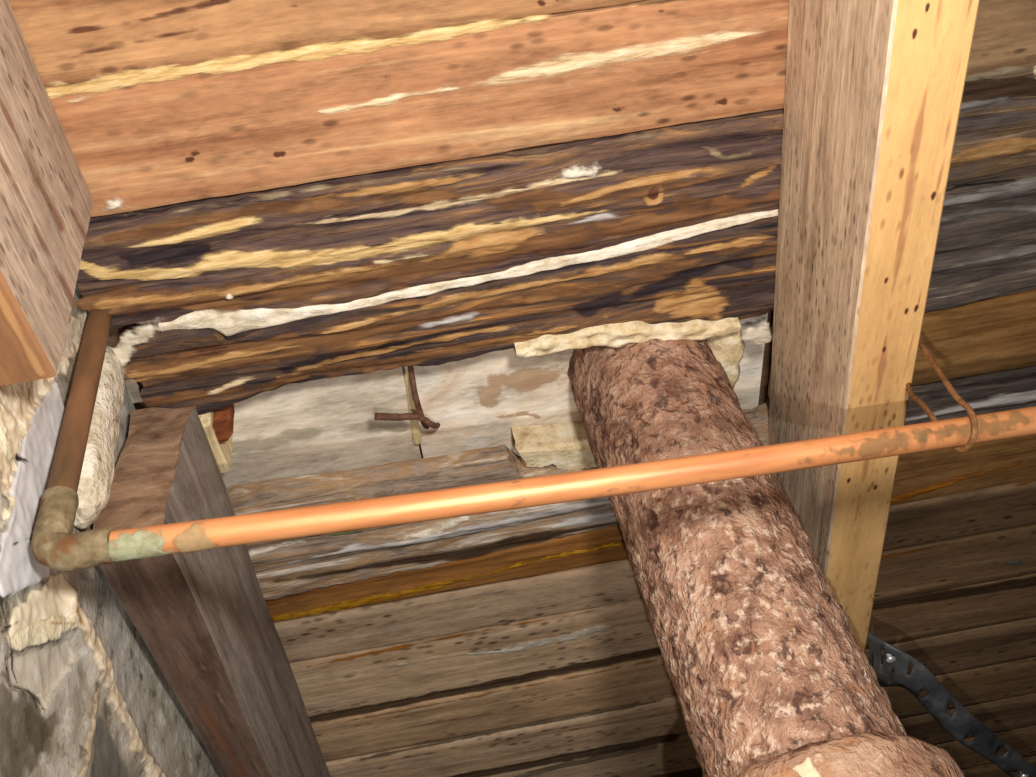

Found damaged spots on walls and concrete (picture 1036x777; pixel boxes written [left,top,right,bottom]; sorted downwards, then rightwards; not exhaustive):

leakage [0,684,56,777]